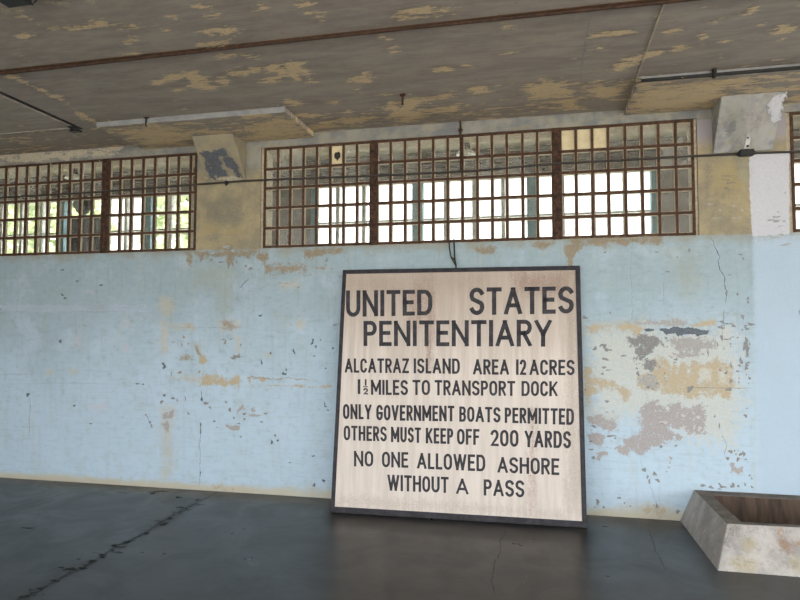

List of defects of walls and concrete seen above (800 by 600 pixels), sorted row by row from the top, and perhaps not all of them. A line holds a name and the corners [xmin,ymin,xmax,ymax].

peeling [390,4,461,22]
peeling [151,3,319,94]
peeling [3,74,98,124]
peeling [282,90,466,132]
spalling [519,45,788,151]
spalling [199,147,243,182]
peeling [194,245,333,291]
crack [711,239,729,334]
peeling [213,401,267,438]
peeling [173,368,332,389]
spalling [581,312,755,490]
crack [16,422,219,600]